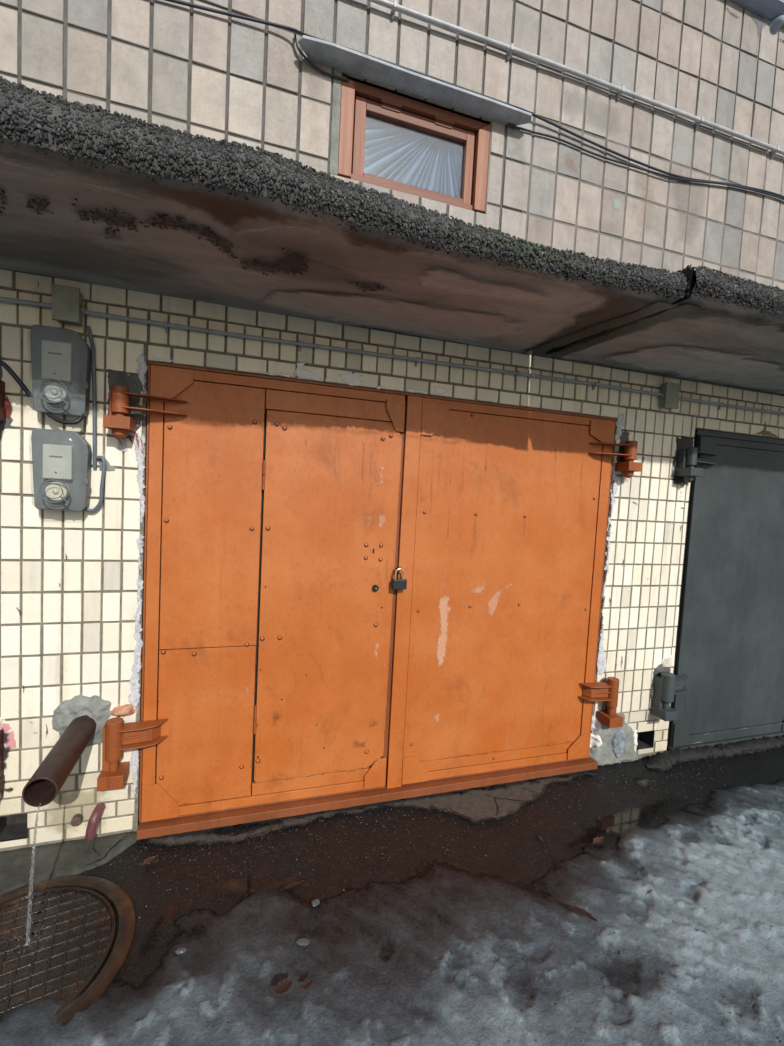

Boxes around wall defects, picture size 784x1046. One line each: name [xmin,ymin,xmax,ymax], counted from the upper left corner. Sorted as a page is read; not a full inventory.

leakage [0,150,294,236]
leakage [521,290,784,358]
peeling [136,353,173,394]
peeling [258,362,362,386]
peeling [615,414,624,441]
peeling [118,432,145,523]
peeling [597,474,619,675]
peeling [128,536,144,708]
peeling [130,749,139,794]